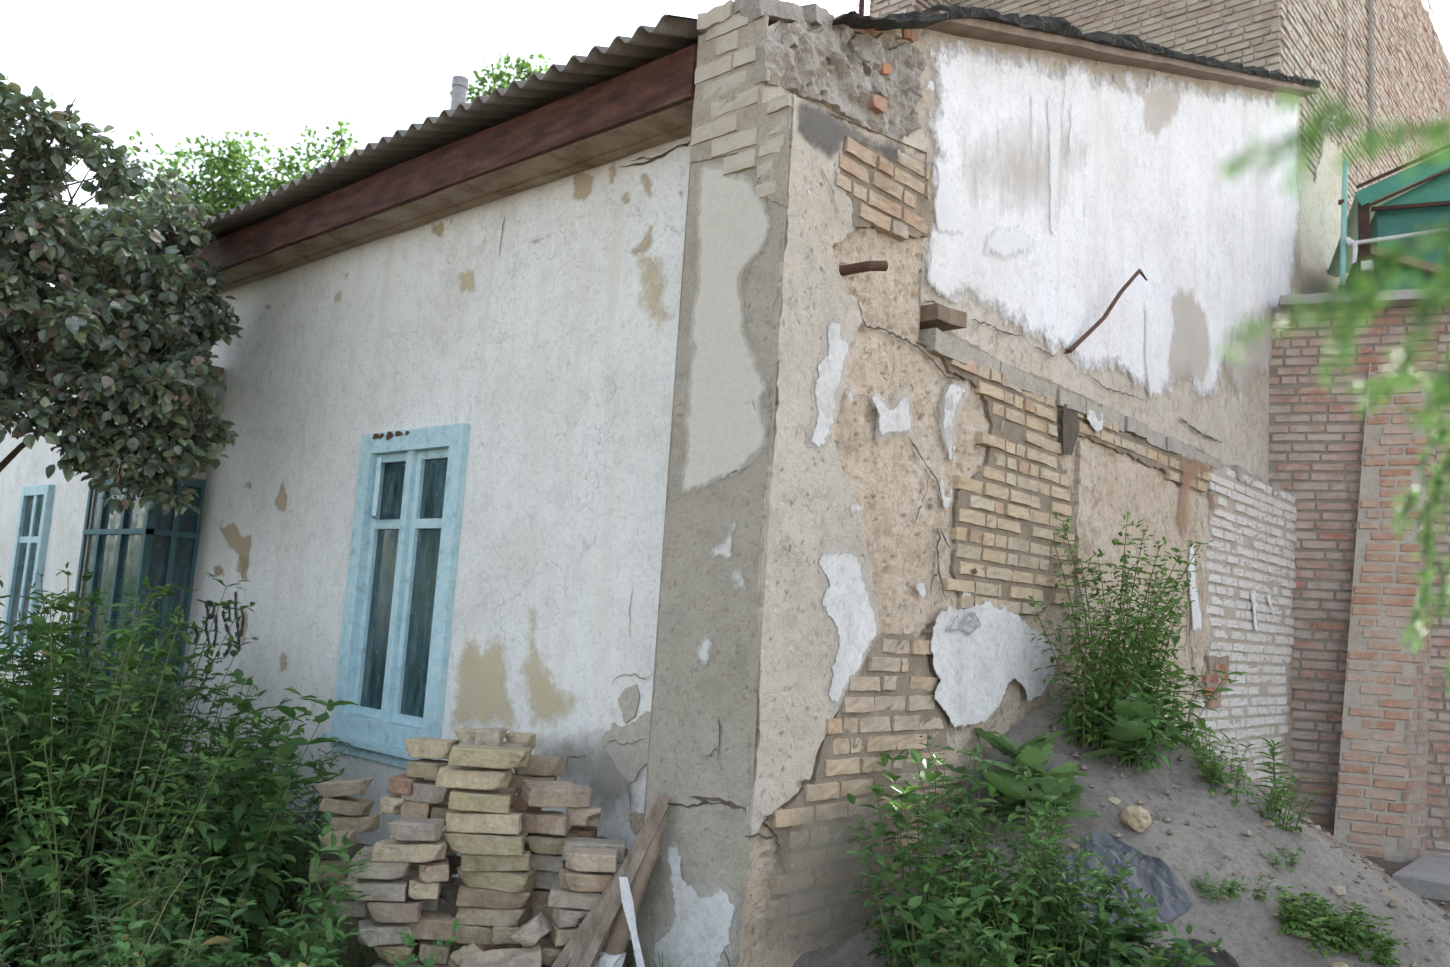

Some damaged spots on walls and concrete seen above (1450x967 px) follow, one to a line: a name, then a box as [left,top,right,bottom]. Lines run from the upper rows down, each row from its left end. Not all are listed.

spalling [691,12,931,242]
crack [858,298,977,387]
peeling [215,525,251,579]
spalling [943,358,1297,788]
crack [566,739,642,770]
spalling [770,639,964,888]
crack [668,796,779,840]